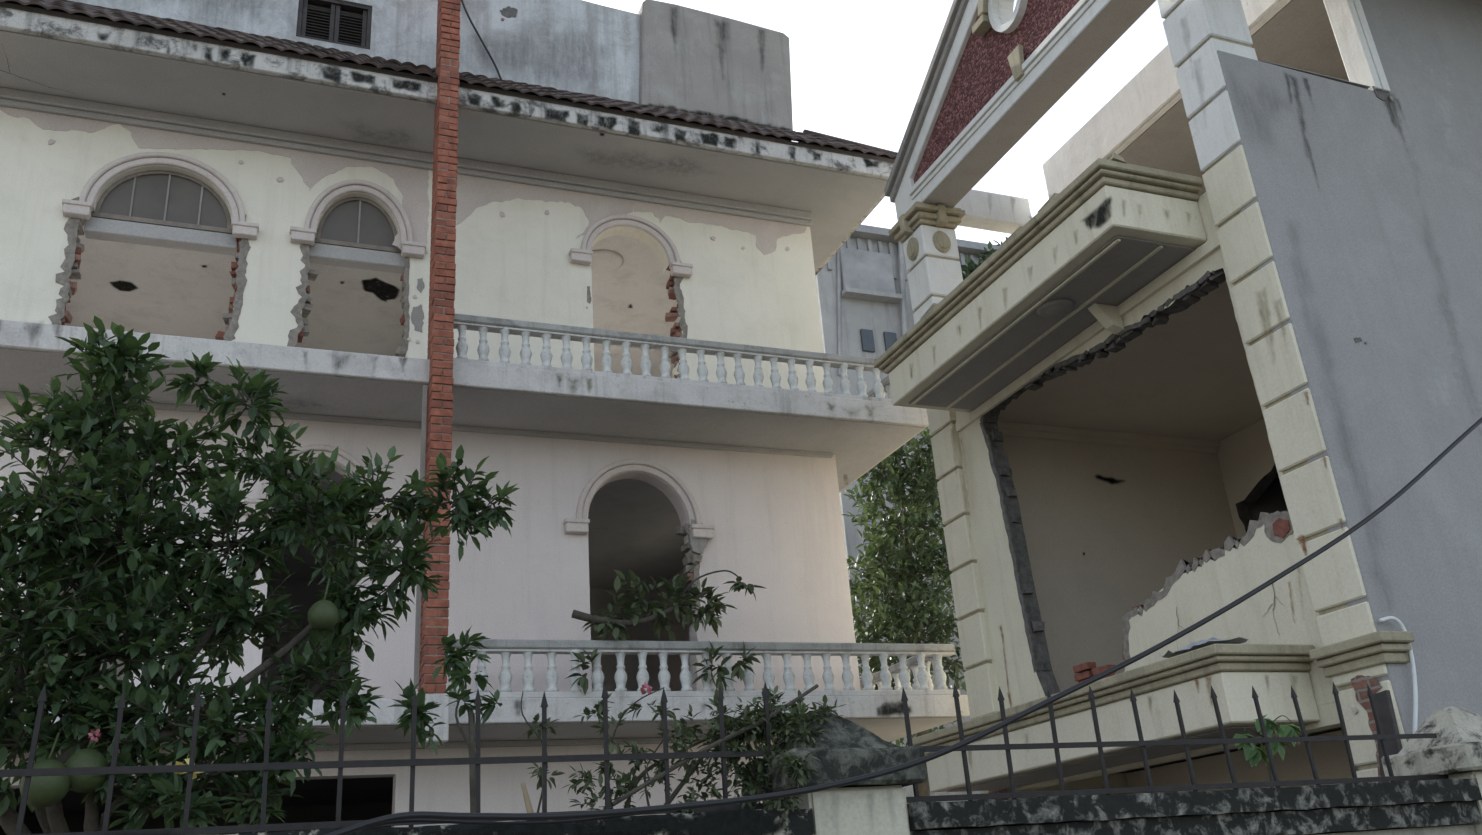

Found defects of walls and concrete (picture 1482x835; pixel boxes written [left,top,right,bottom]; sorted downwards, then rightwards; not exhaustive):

peeling [0,106,430,357]
peeling [456,174,807,255]
spalling [665,260,688,379]
spalling [980,270,1226,673]
spalling [1121,510,1294,661]
water stain [348,807,785,835]